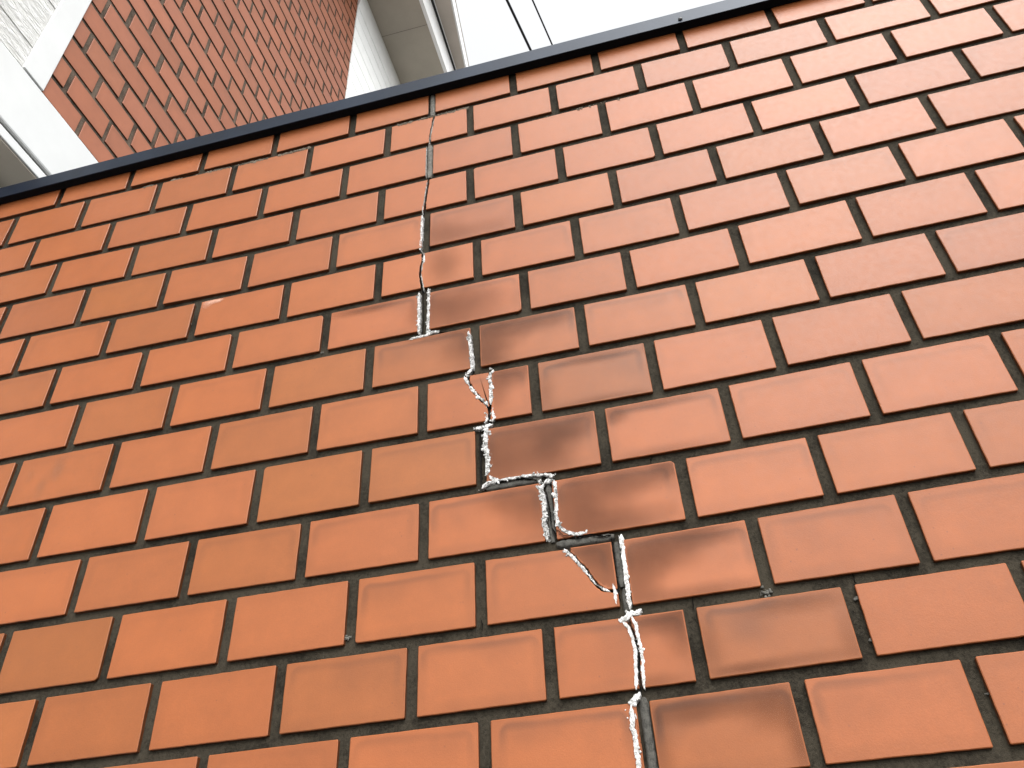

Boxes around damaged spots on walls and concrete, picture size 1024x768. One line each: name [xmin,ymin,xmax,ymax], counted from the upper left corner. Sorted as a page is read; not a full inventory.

crack [420,174,446,335]
crack [465,371,643,765]